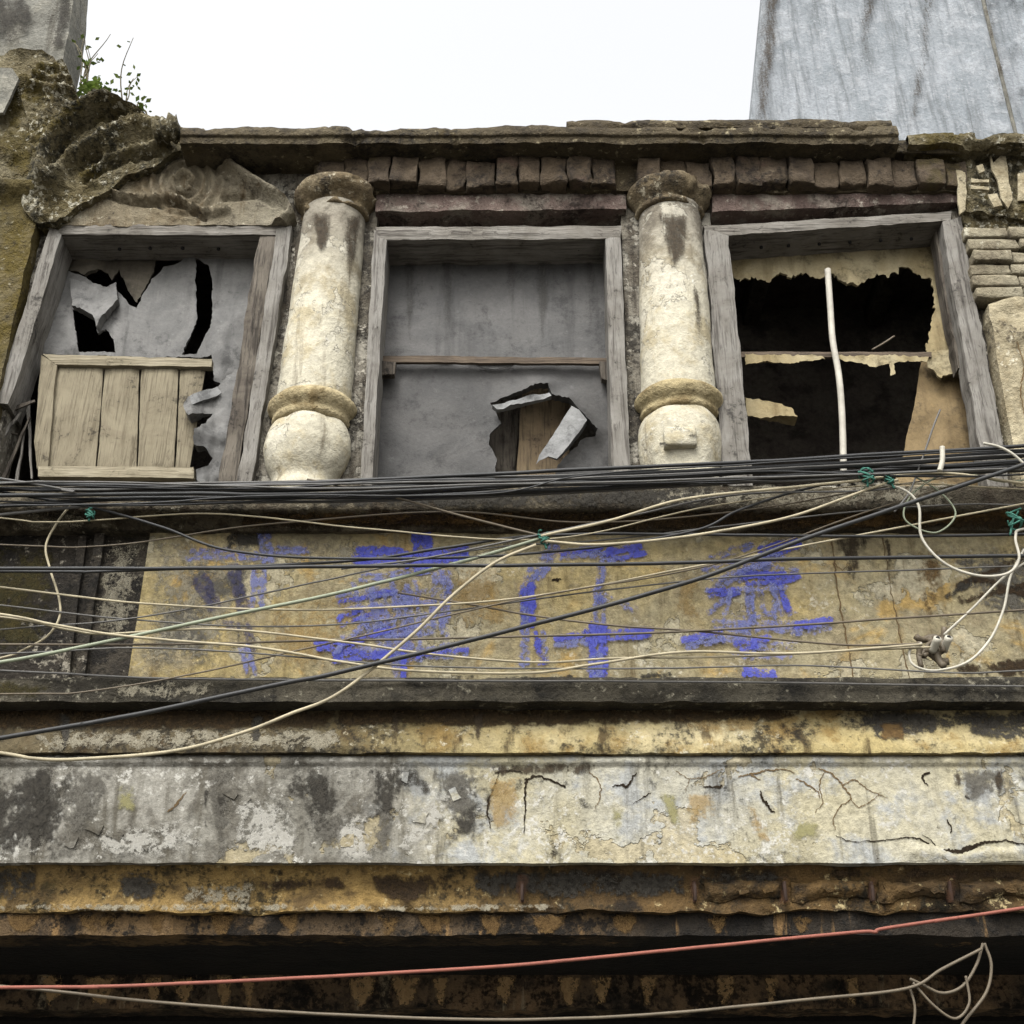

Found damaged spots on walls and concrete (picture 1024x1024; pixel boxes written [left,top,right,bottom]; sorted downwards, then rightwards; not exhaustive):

damp [314,213,330,249]
damp [345,216,360,266]
damp [659,213,686,265]
damp [0,768,110,855]
damp [288,775,356,845]
crack [486,770,566,831]
crack [676,768,1024,854]